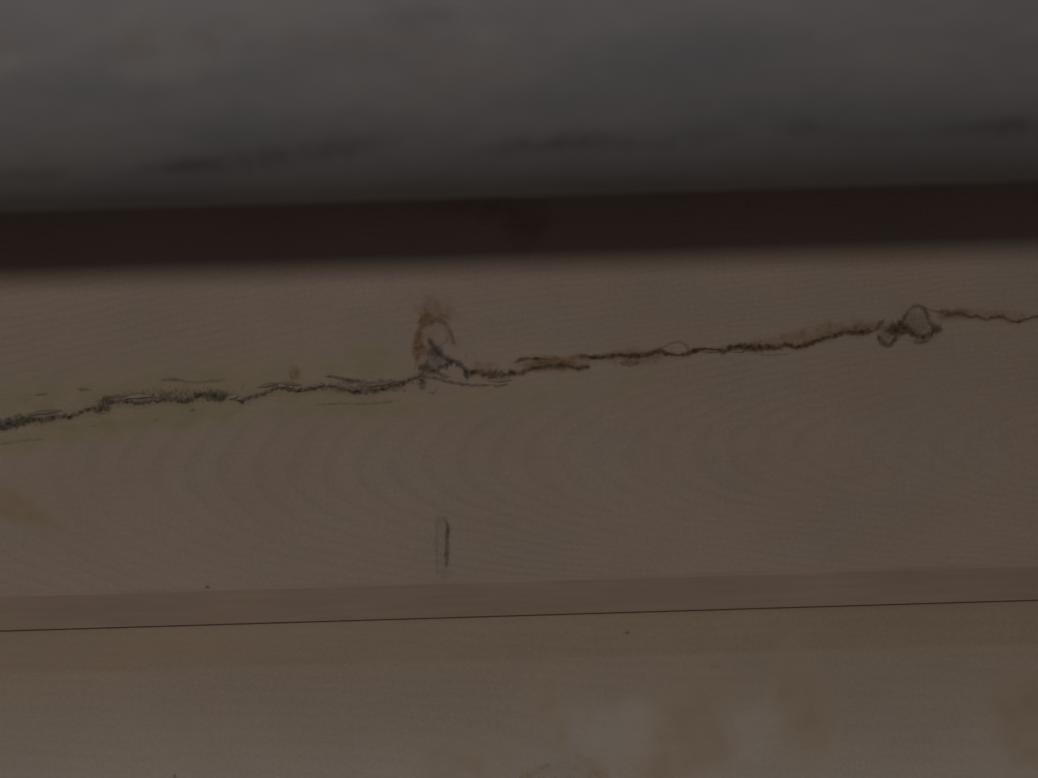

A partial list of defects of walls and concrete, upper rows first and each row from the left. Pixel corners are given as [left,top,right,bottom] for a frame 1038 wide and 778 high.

crack [945,312,1038,323]
crack [469,328,873,382]
crack [0,376,421,429]